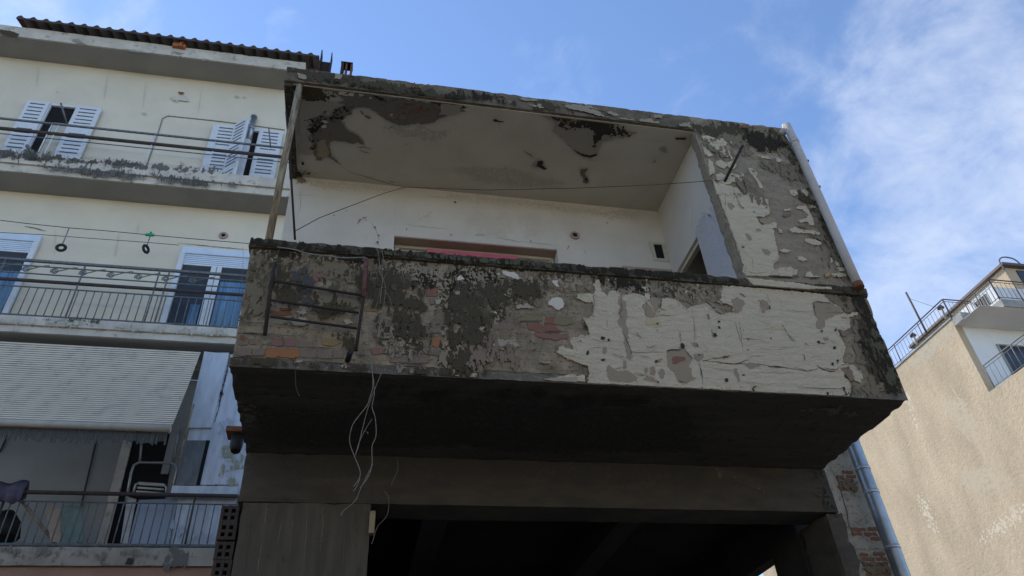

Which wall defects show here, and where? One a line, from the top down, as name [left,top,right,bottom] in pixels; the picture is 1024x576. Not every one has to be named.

mould [0,148,244,187]
peeling [297,73,446,165]
spalling [541,115,637,184]
peeling [727,200,777,256]
flaking render [236,337,300,359]
water stain [0,237,742,378]
peeling [601,297,704,384]
crack [508,249,862,389]
water stain [692,119,953,428]
flaking render [851,527,891,576]